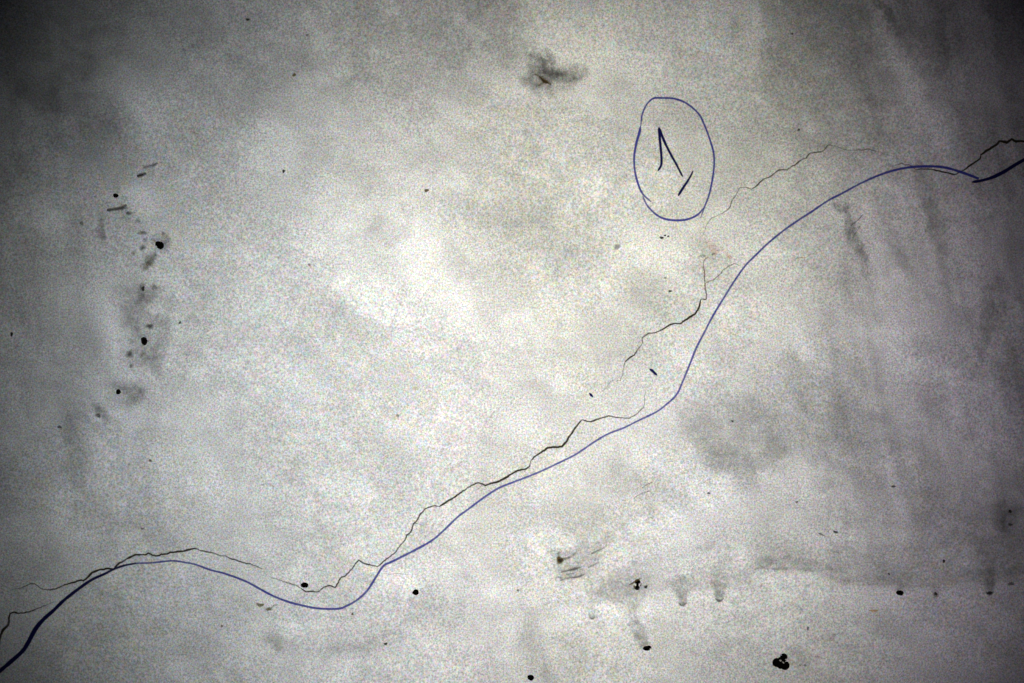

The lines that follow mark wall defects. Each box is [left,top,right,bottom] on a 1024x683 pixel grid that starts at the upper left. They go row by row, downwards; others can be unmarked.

crack [729,145,828,208]
crack [923,138,1024,175]
crack [624,264,707,364]
crack [290,410,641,592]
crack [0,548,255,639]